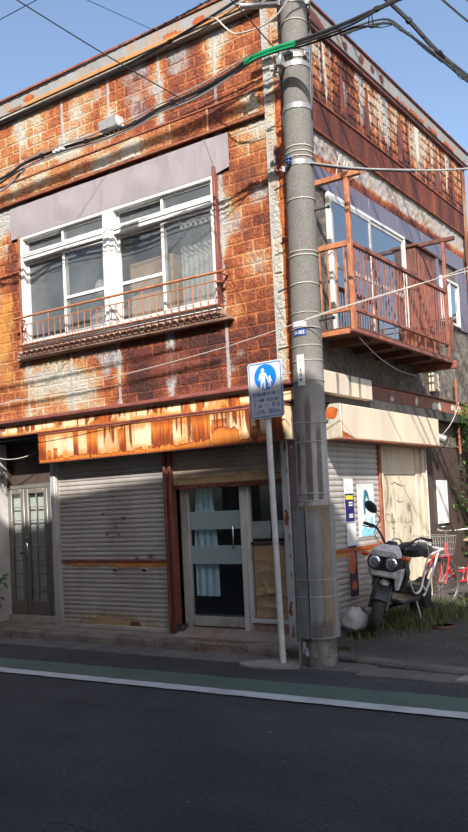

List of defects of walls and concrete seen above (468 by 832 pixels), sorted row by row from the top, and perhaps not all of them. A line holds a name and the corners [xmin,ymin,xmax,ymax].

corrosion [24,1,251,106]
corrosion [0,393,286,463]